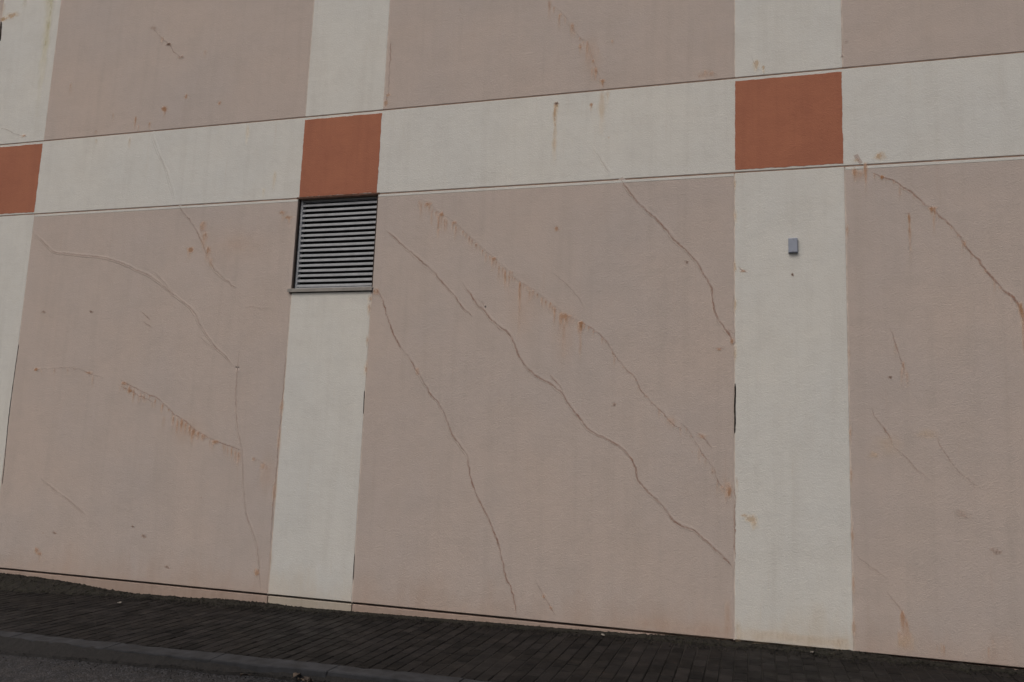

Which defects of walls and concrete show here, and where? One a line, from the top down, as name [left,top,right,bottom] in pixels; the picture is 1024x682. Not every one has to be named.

crack [619,177,735,344]
crack [870,170,1024,318]
crack [2,345,270,483]
crack [374,286,518,614]
crack [385,228,735,568]
crack [731,384,739,433]